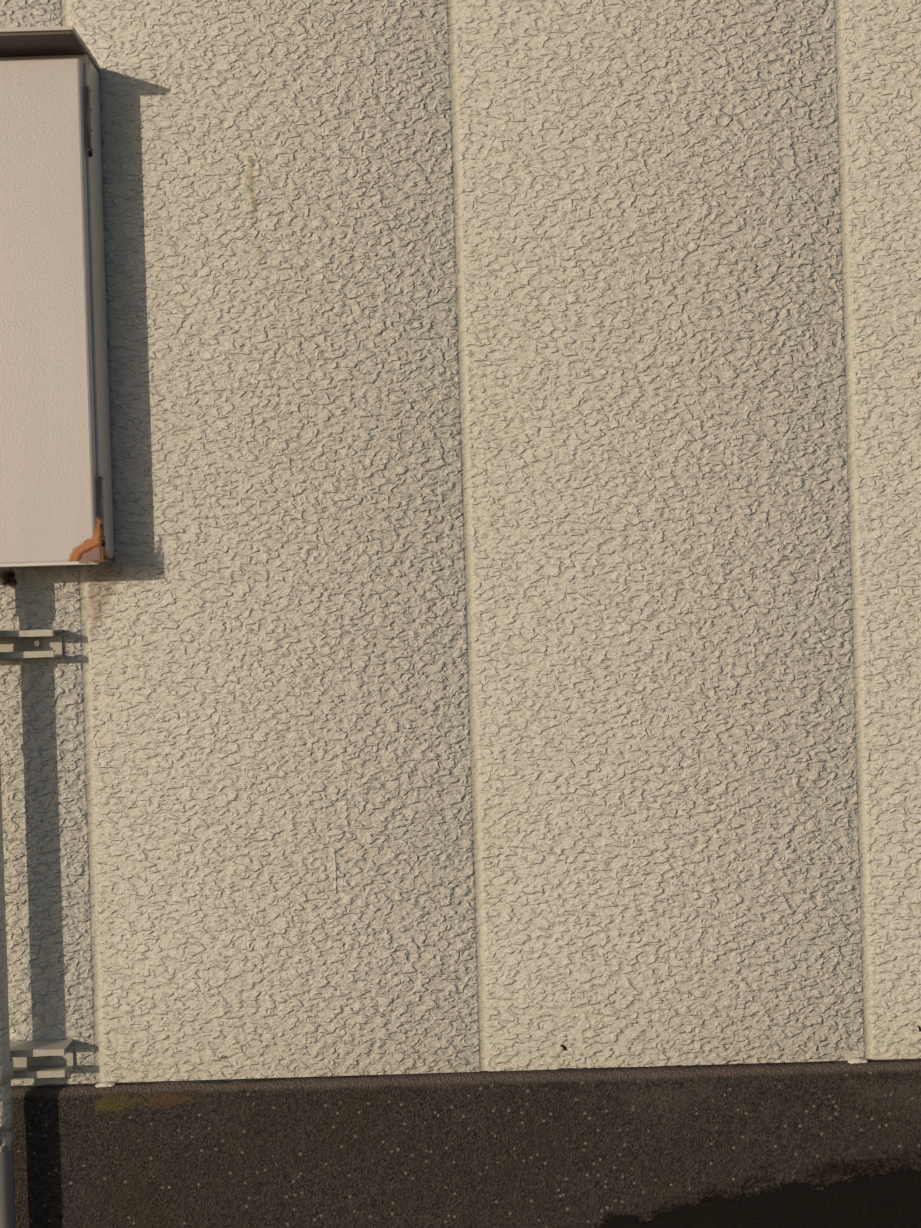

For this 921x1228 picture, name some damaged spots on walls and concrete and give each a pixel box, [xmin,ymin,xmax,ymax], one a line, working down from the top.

water stain [594,1153,921,1228]